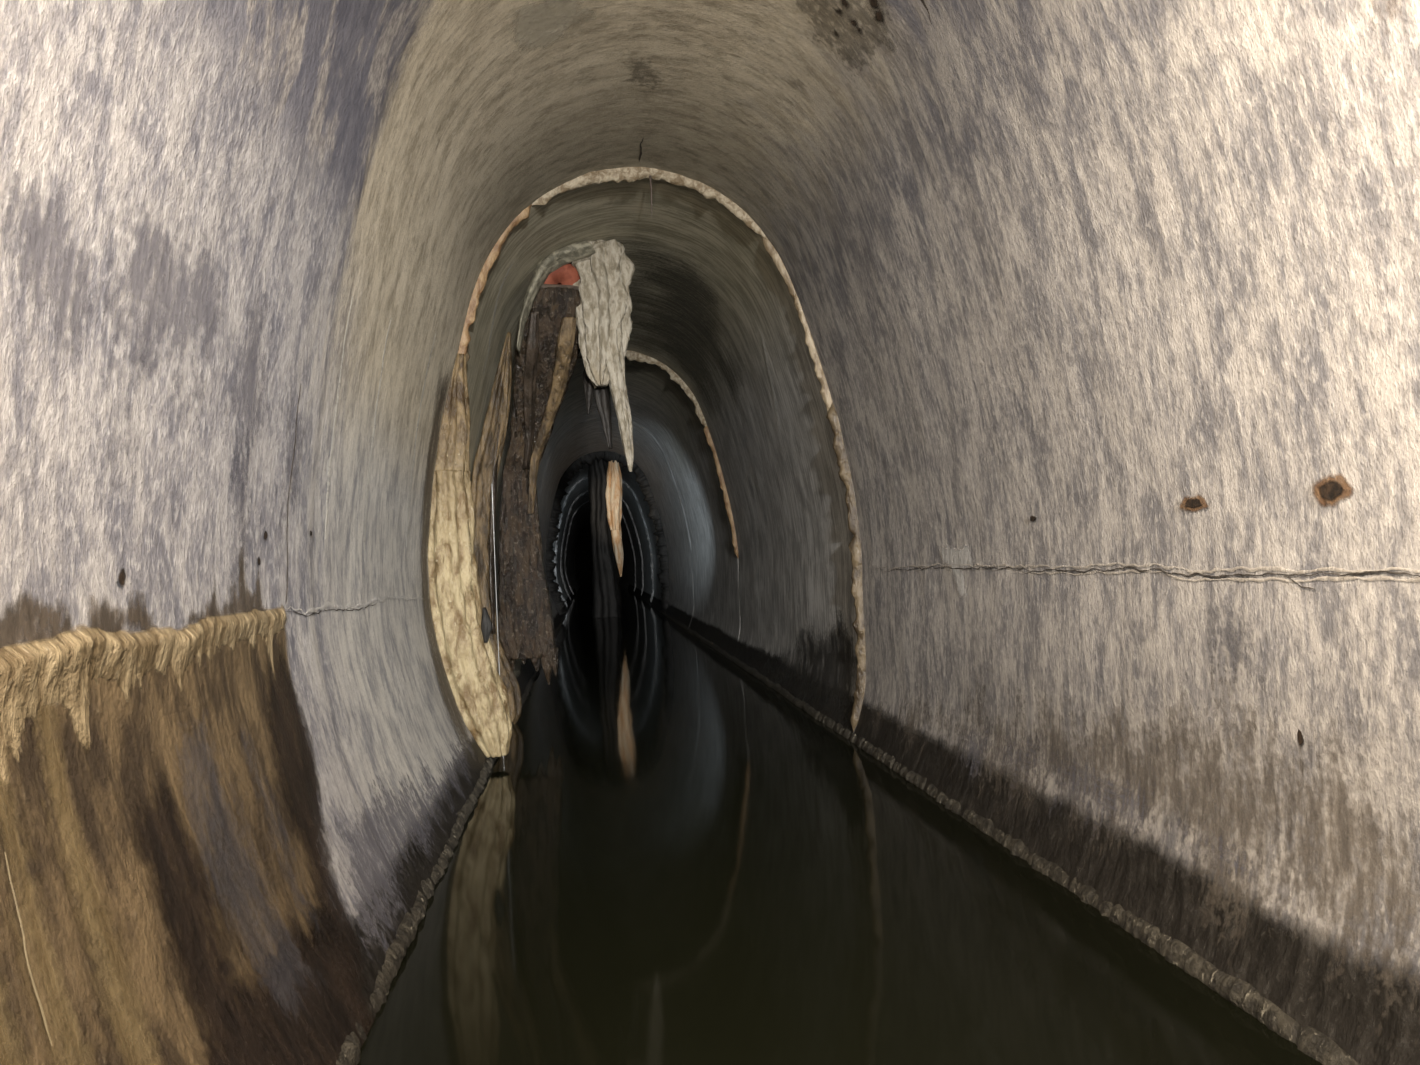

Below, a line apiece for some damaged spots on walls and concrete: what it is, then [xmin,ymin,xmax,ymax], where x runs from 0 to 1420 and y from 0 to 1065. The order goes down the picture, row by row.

water stain [0,293,487,1065]
crack [878,562,1420,589]